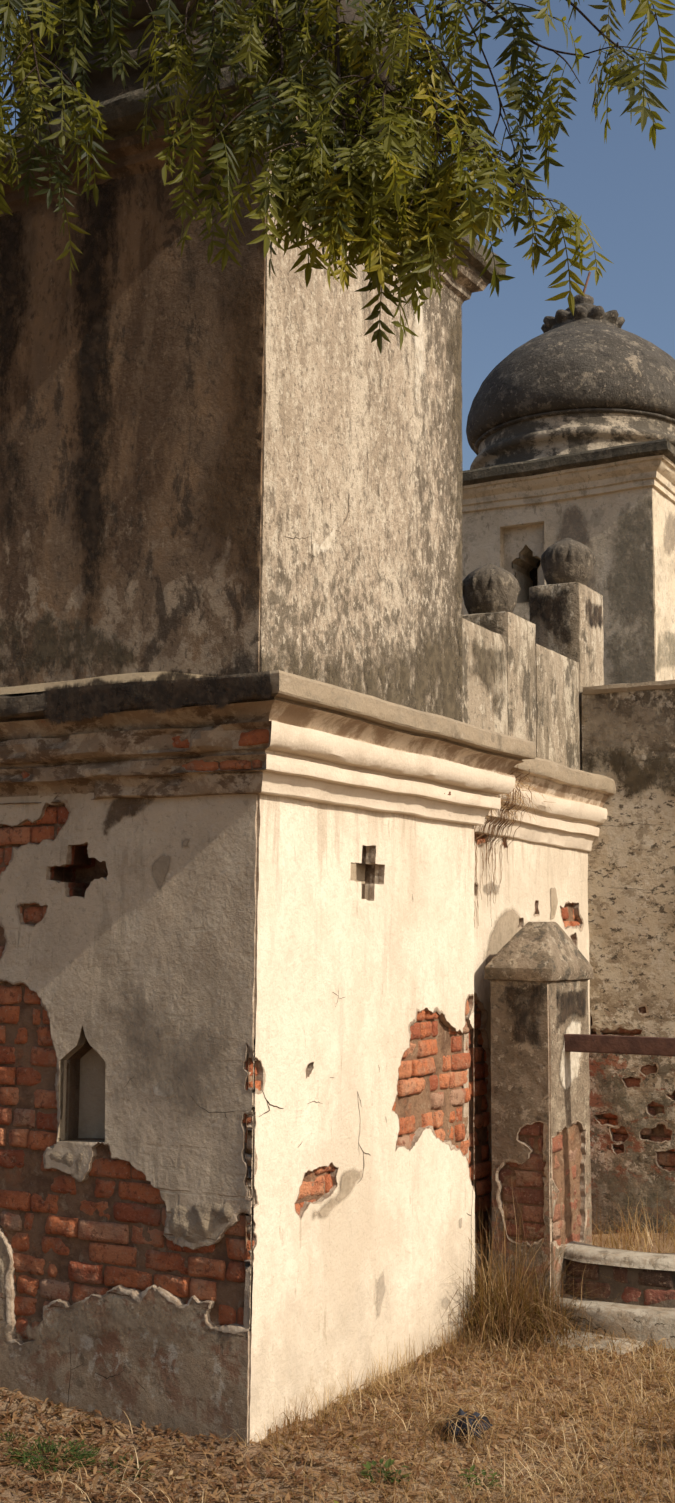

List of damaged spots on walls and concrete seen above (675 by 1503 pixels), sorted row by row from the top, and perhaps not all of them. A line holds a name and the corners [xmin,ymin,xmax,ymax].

damp [0,179,133,672]
damp [205,275,264,588]
damp [262,282,463,722]
damp [558,506,589,545]
damp [665,516,675,553]
flaking render [172,729,269,771]
spalling [0,798,71,875]
spalling [0,901,48,960]
spalling [518,888,584,948]
spalling [392,992,675,1249]
spalling [0,979,266,1345]
spalling [295,1162,362,1220]